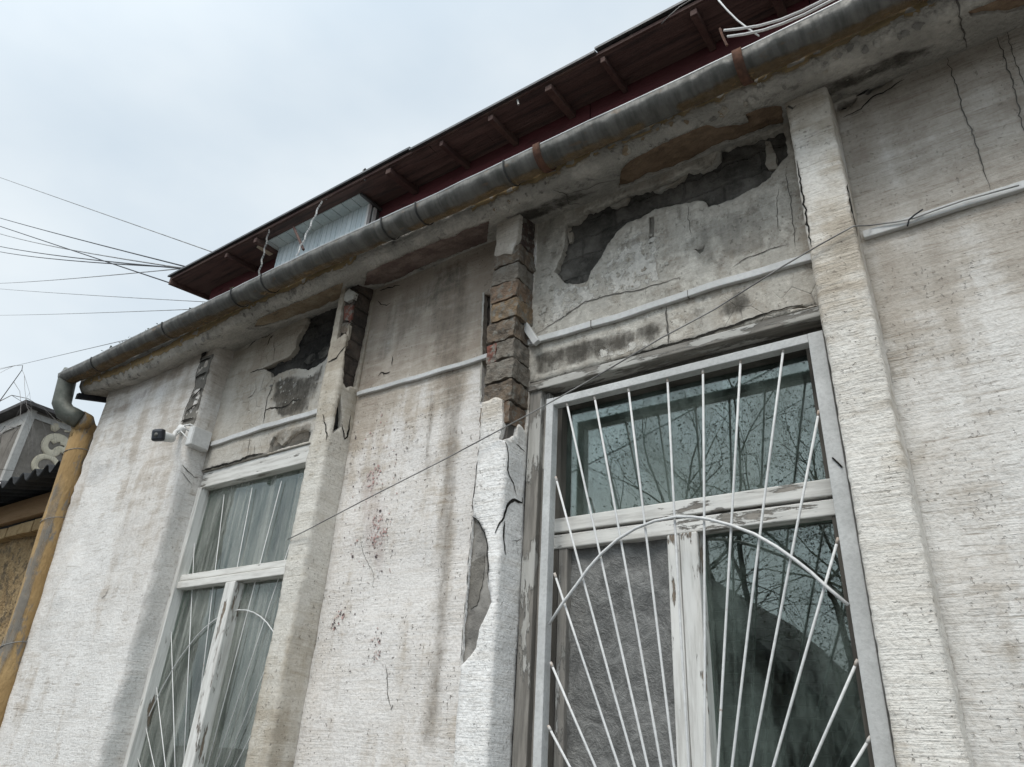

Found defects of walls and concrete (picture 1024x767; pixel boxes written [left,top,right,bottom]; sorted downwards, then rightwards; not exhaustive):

crack [843,79,904,118]
crack [947,0,990,187]
crack [997,32,1024,130]
flaking render [556,106,788,319]
crack [736,164,812,265]
flaking render [181,352,214,426]
crack [323,415,351,439]
flaking render [255,221,489,404]
flaking render [479,217,536,440]
water stain [537,325,658,372]
flaking render [463,519,491,663]
crack [460,437,525,658]